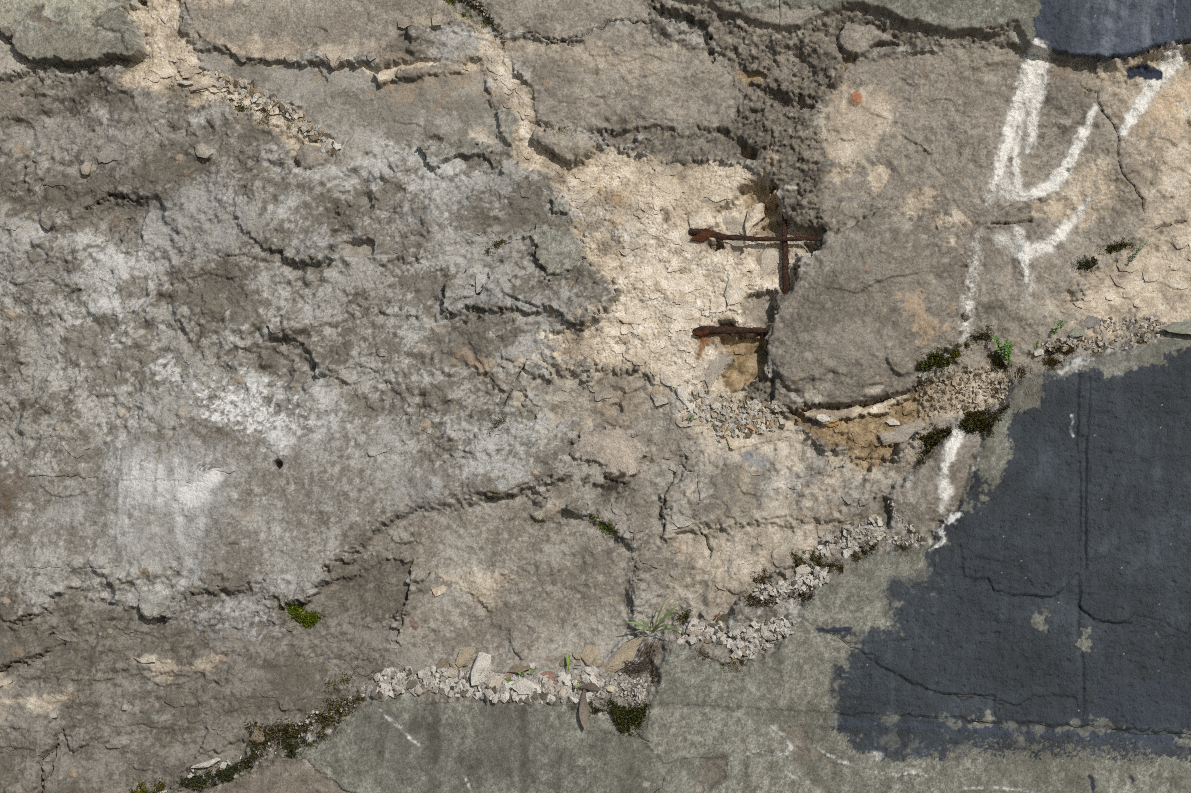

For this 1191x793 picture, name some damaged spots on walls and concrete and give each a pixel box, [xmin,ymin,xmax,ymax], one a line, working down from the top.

crack [1081,86,1186,230]
corrosion [689,214,822,295]
spalling [473,0,1191,472]
spalling [0,0,949,793]
crack [659,469,711,554]
crack [806,621,1191,739]